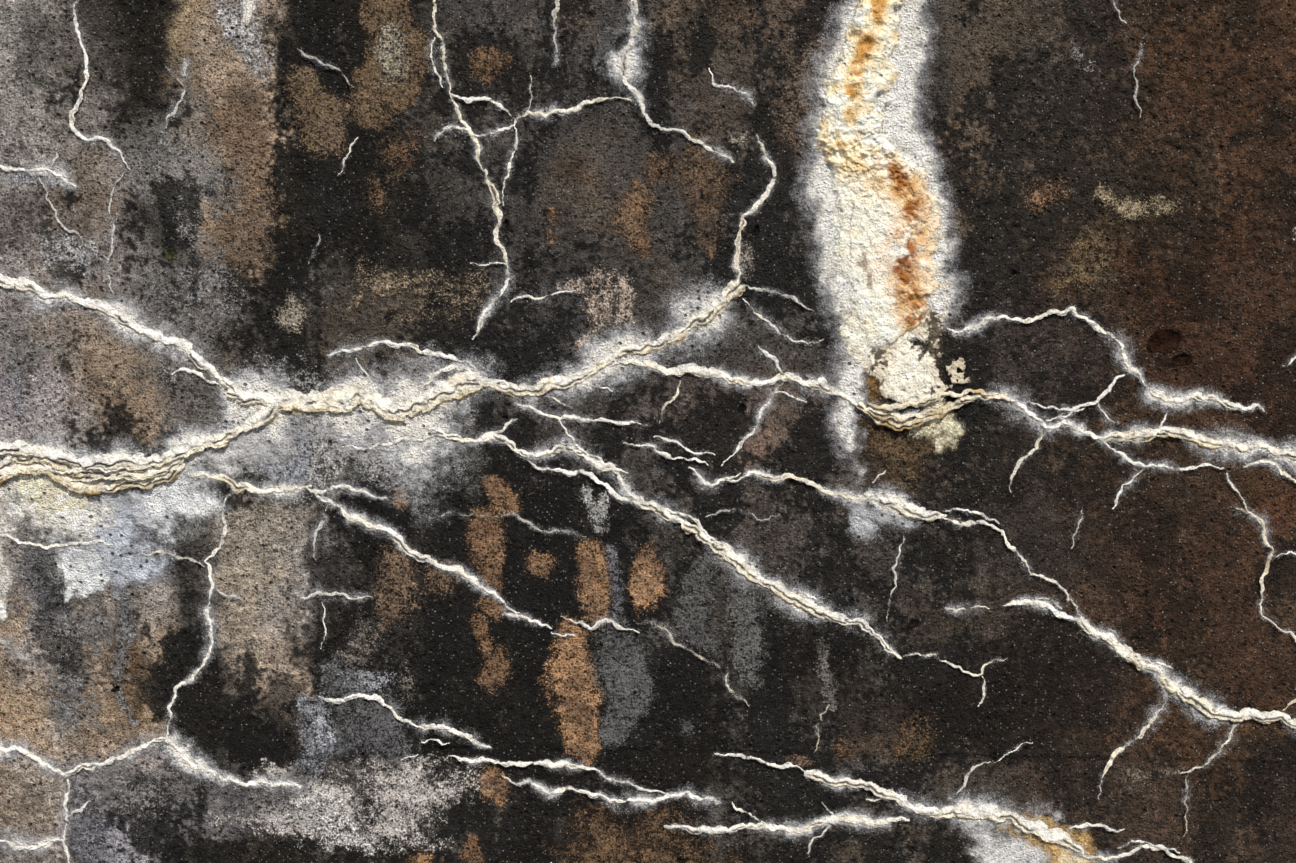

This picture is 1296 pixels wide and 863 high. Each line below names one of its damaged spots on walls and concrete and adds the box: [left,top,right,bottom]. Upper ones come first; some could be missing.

crack [0,1,130,263]
water stain [35,229,111,290]
water stain [0,469,225,735]
crack [0,512,302,863]
water stain [272,291,309,333]
water stain [208,412,416,512]
crack [430,0,734,340]
crack [0,135,1296,707]
crack [319,693,1193,863]
water stain [772,0,970,501]
water stain [849,502,919,539]
crack [623,435,1296,837]